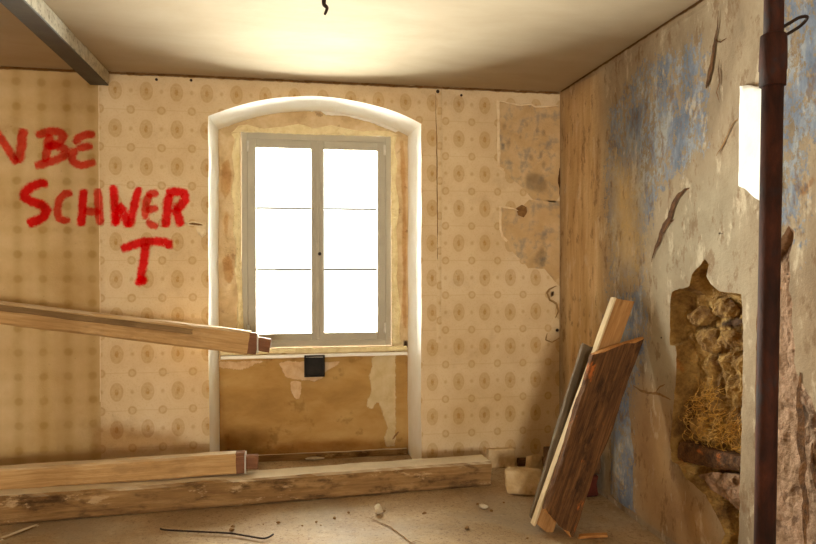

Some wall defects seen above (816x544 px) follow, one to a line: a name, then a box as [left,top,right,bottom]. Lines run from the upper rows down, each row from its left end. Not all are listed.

crack [0,65,76,73]
crack [98,0,726,313]
peeling [738,85,761,200]
crack [96,336,104,402]
peeling [367,355,399,447]
spalling [661,259,743,544]
spalling [776,226,816,544]